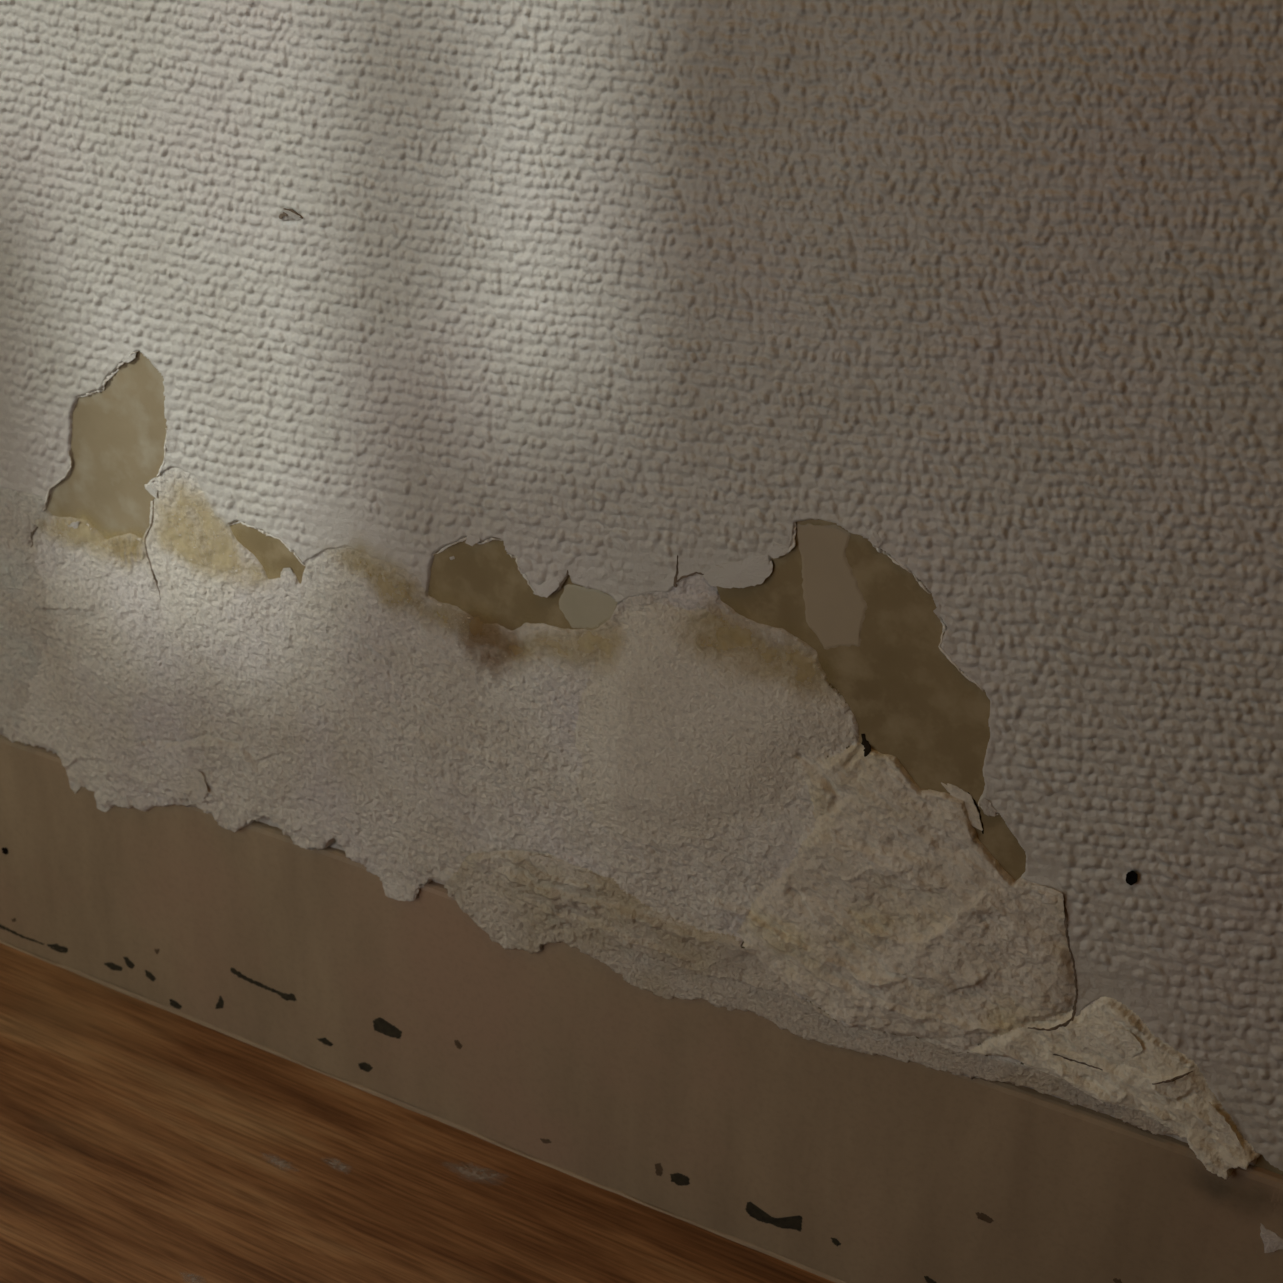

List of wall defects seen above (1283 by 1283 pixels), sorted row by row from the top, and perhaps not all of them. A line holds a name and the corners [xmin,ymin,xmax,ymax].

peeling [0,350,168,743]
peeling [228,521,306,584]
spalling [428,519,1260,1180]
peeling [103,957,156,981]
crack [1028,895,1103,1071]
peeling [373,1017,402,1039]
crack [1152,1071,1193,1085]
peeling [655,1163,690,1186]